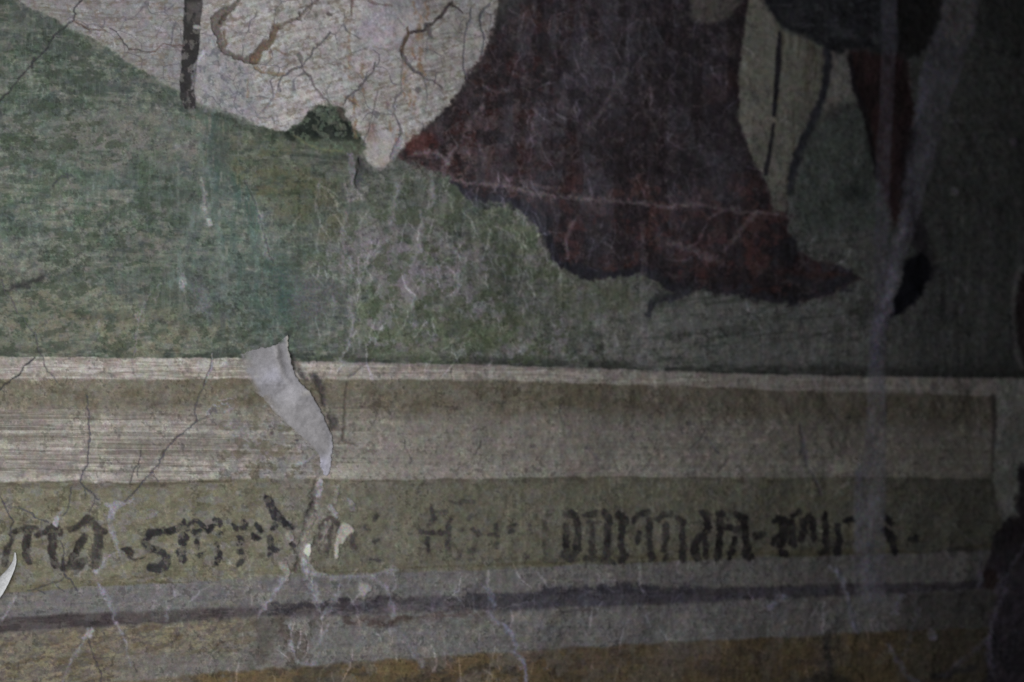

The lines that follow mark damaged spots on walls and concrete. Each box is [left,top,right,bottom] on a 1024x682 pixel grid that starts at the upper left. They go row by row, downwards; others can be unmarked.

crack [209,0,492,163]
crack [0,352,214,595]
peeling [222,335,358,583]
peeling [0,552,17,597]
crack [87,637,138,682]